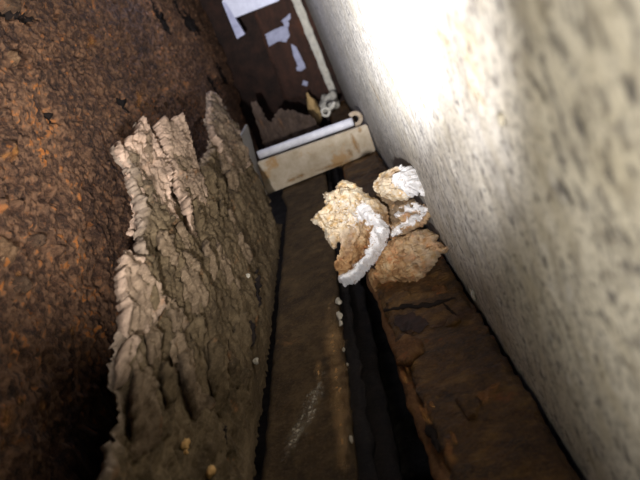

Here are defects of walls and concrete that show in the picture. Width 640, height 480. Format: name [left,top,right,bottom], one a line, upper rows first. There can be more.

peeling [265,13,306,72]
corrosion [7,51,21,69]
corrosion [0,237,19,265]
corrosion [96,91,283,480]
crack [384,297,457,316]